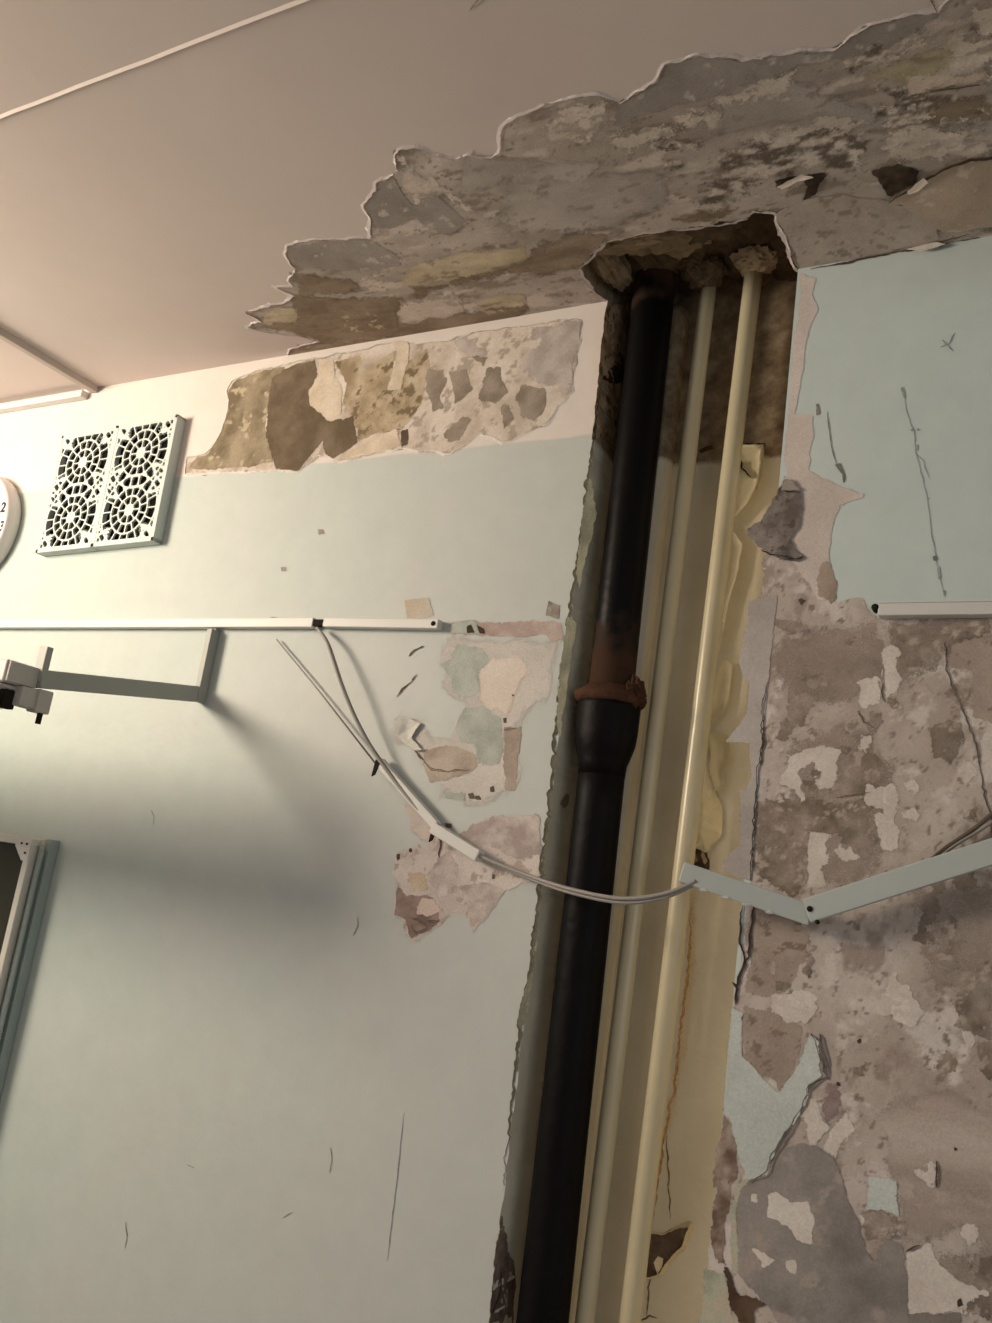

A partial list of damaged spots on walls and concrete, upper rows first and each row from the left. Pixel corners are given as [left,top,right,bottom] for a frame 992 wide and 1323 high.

peeling [184,0,949,476]
crack [888,157,992,206]
spalling [578,210,864,722]
crack [901,387,945,597]
peeling [404,597,434,619]
peeling [389,601,564,942]
rust [625,674,647,709]
flaking render [490,1217,516,1323]